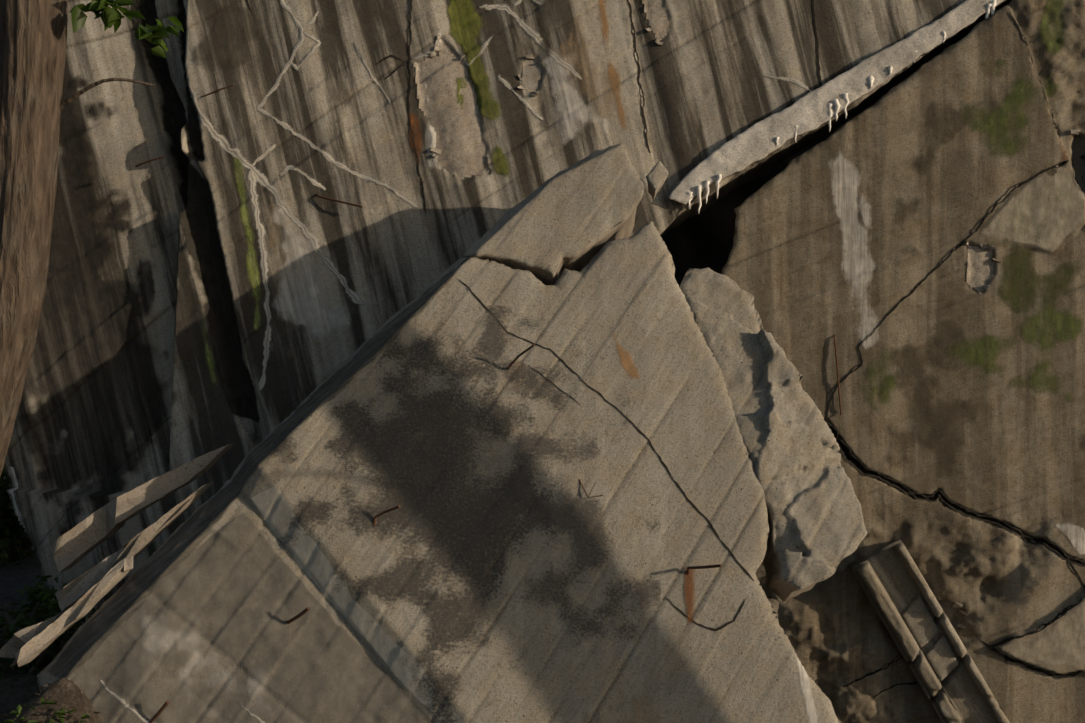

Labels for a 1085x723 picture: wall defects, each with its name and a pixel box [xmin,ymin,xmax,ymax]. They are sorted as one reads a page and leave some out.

water stain [15,78,175,536]
water stain [139,0,259,422]
water stain [277,233,349,333]
water stain [428,126,437,166]
water stain [541,0,588,138]
crack [627,0,651,153]
crack [825,12,1085,679]
water stain [983,155,1085,251]
water stain [50,256,661,723]
crack [460,280,754,631]
rust [685,568,694,623]
crack [843,654,918,698]